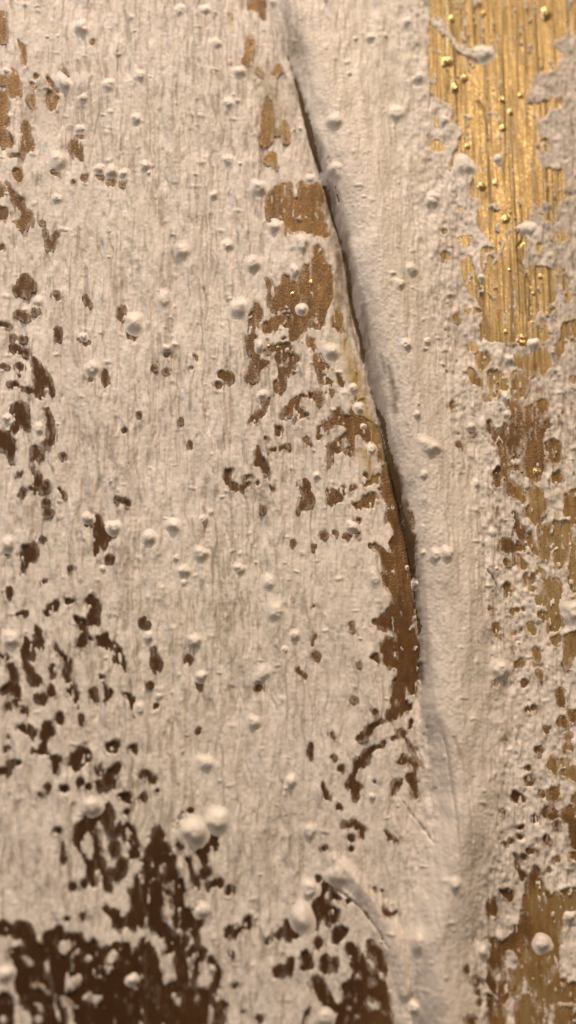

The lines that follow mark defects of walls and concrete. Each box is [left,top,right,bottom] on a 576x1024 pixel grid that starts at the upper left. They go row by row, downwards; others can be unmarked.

peeling [0,11,59,252]
peeling [5,535,47,573]
peeling [0,273,68,519]
peeling [88,369,111,388]
peeling [150,354,172,377]
peeling [212,97,421,852]
crack [288,58,423,659]
peeling [427,0,576,688]
peeling [0,595,252,1024]
peeling [265,918,299,945]
peeling [272,875,395,1024]
peeling [463,687,576,1024]